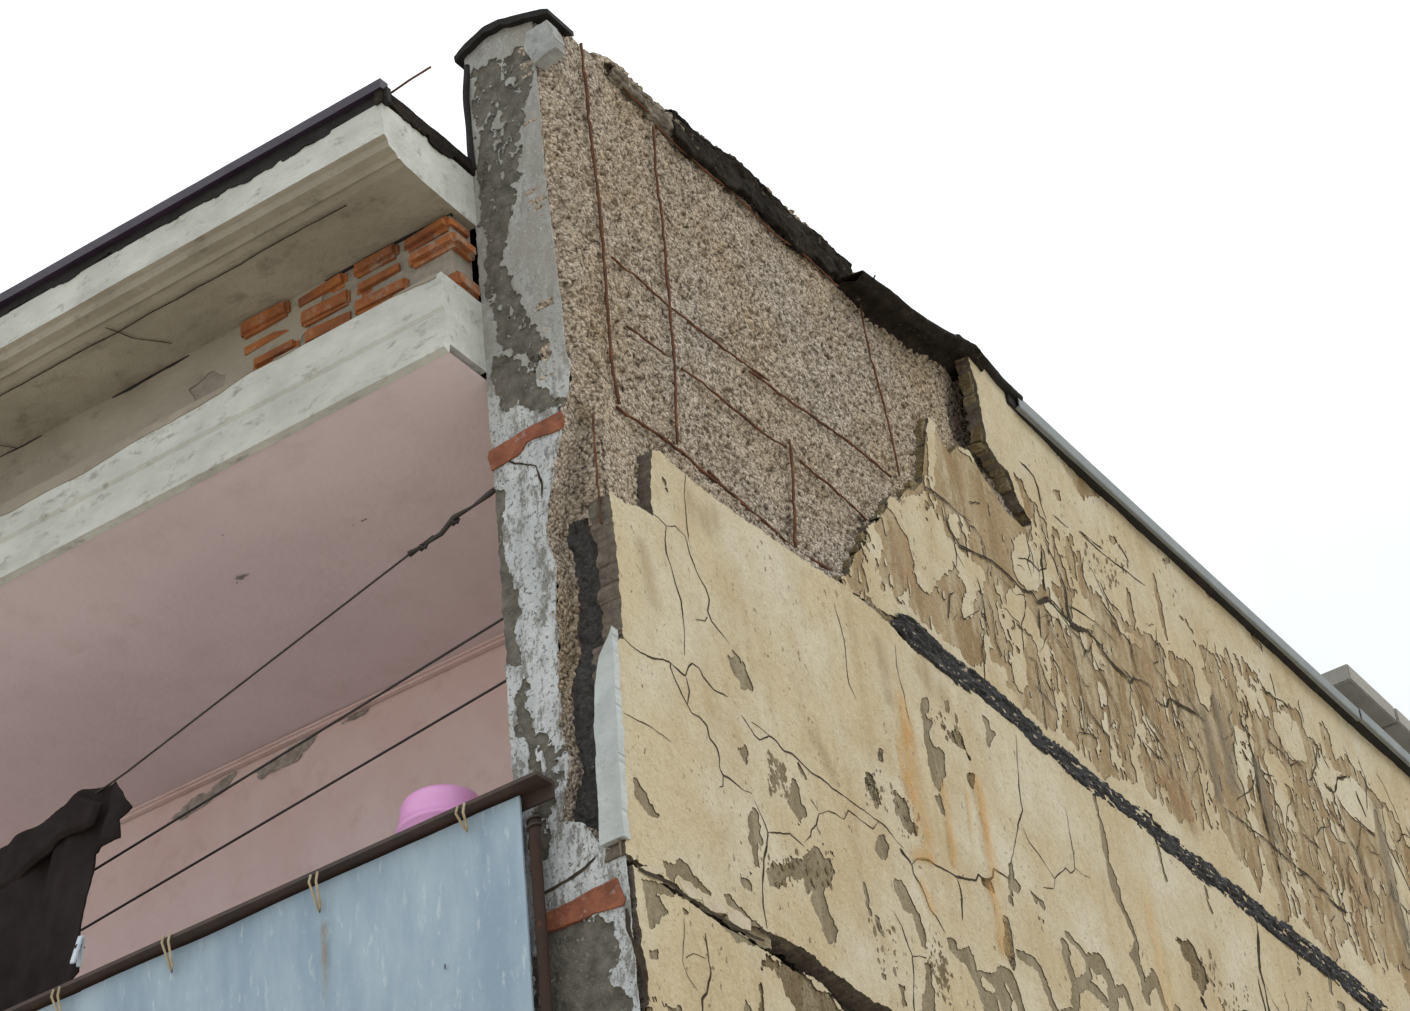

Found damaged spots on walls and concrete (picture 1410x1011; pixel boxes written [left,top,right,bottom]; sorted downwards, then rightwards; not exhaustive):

peeling [0,374,248,516]
crack [0,205,347,396]
spalling [471,31,1410,1011]
crack [624,463,1410,1011]